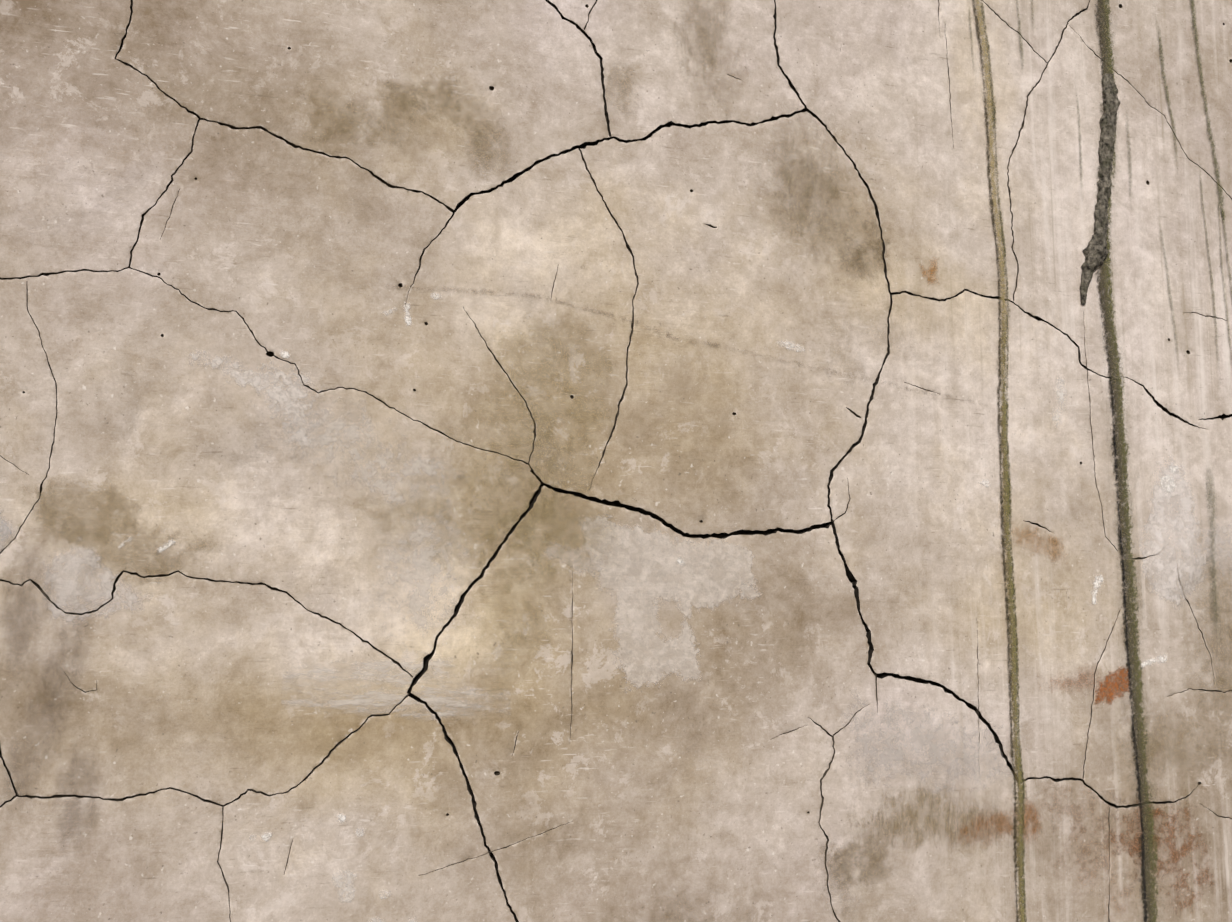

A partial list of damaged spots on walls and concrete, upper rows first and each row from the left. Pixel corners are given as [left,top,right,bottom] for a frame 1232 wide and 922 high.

crack [1077,33,1232,199]
crack [0,0,1110,525]
crack [1090,409,1118,551]
crack [1125,377,1232,429]
crack [0,287,1019,922]
crack [1021,611,1199,863]
corrosion [1095,668,1130,704]
crack [1167,596,1232,697]